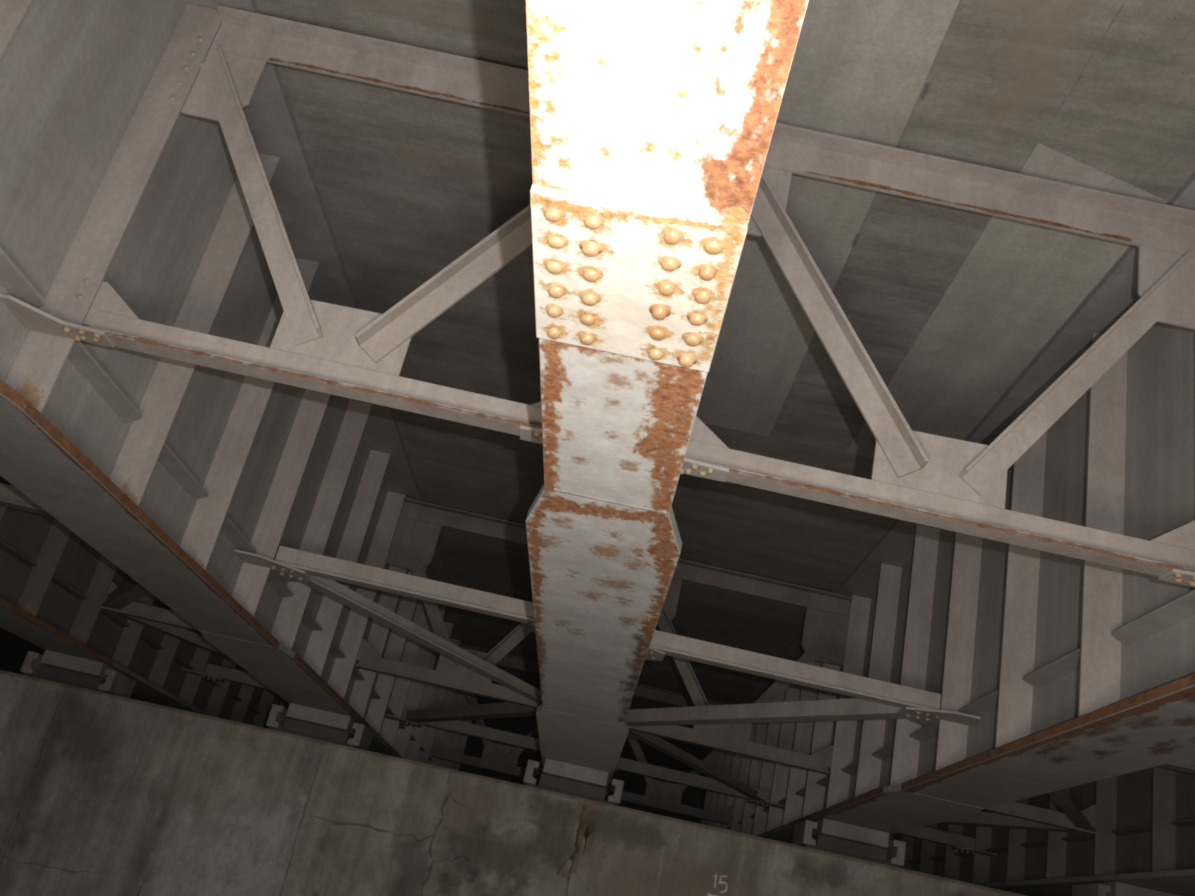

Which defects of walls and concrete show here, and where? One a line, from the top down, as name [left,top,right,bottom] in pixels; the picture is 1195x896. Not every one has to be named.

rust [106,0,808,728]
rust [790,673,1195,828]